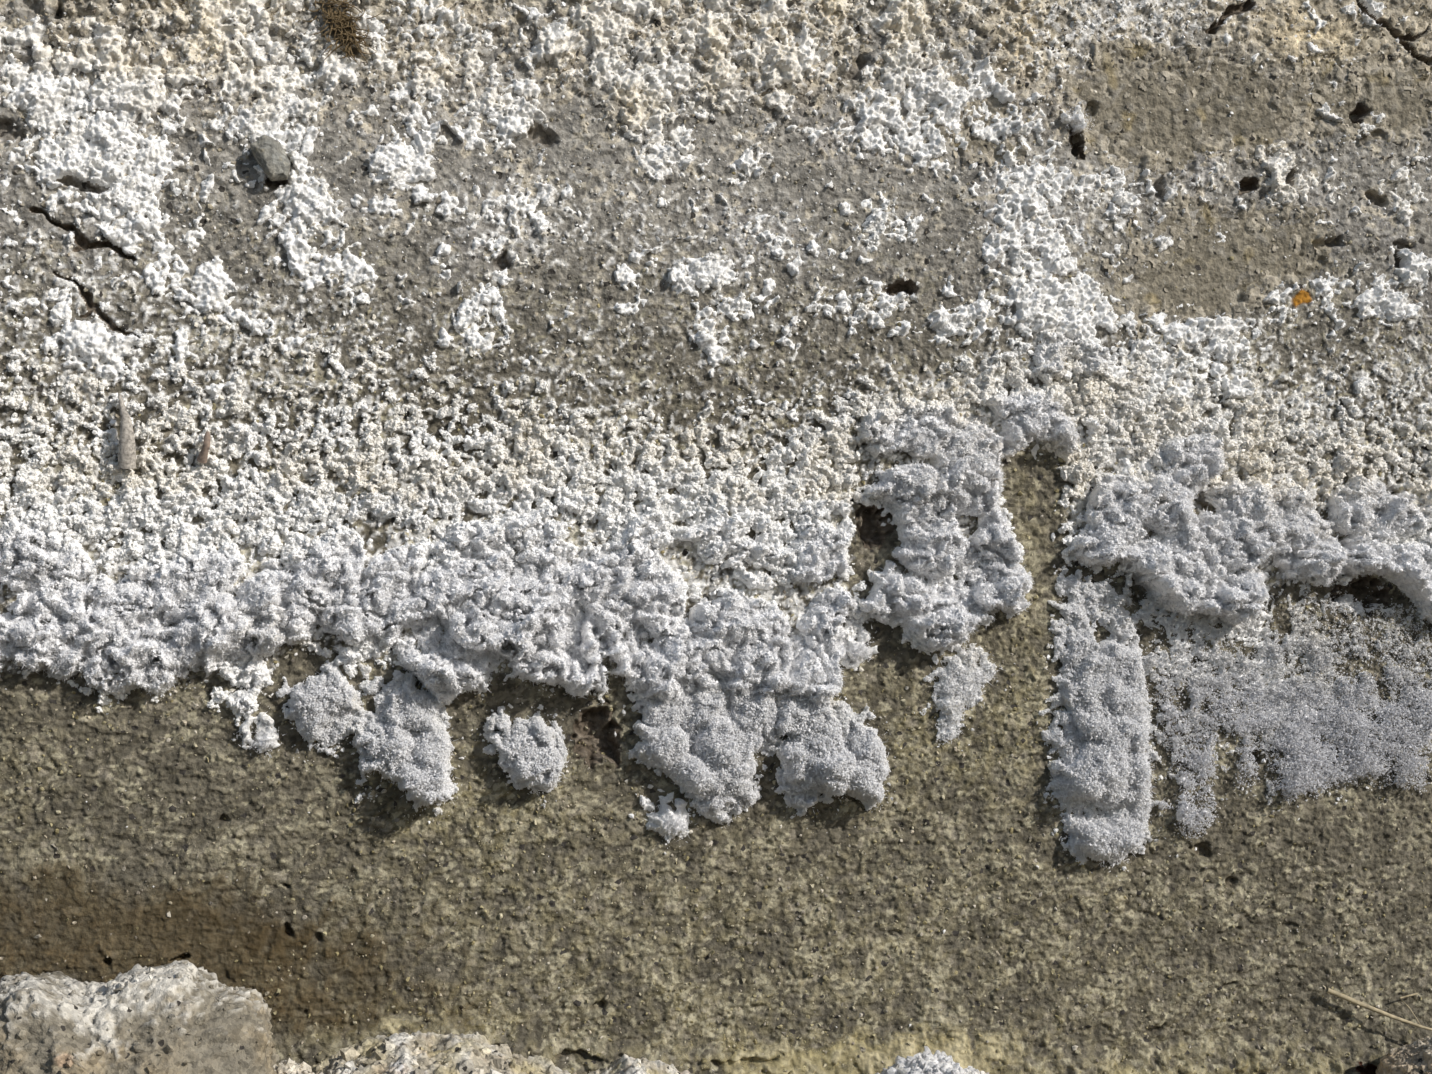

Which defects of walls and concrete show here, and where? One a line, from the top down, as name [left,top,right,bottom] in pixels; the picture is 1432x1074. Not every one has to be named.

crack [1205,0,1255,35]
crack [1356,0,1432,66]
crack [29,207,140,339]
leakage [0,279,1432,839]